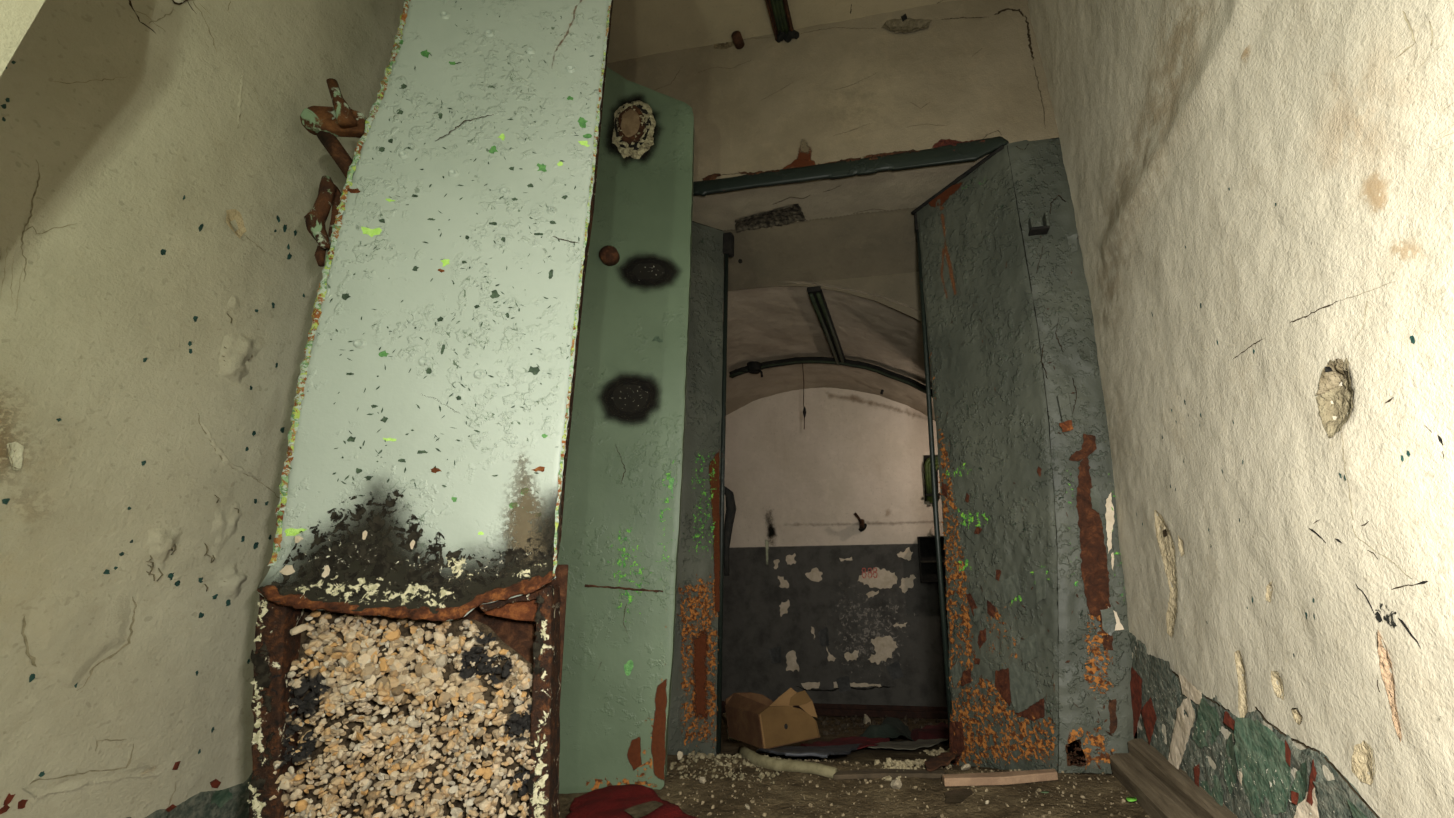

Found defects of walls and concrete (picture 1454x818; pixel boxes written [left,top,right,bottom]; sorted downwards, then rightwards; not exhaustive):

corrosion [267,0,411,566]
peeling [353,119,580,386]
peeling [318,300,480,502]
flaking render [1316,358,1354,438]
peeling [241,528,307,549]
peeling [280,565,295,575]
corrosion [586,449,720,791]
peeling [773,553,823,616]
peeling [768,623,906,692]
peeling [839,547,916,598]
corrosion [938,420,1125,768]
peeling [1128,632,1380,818]